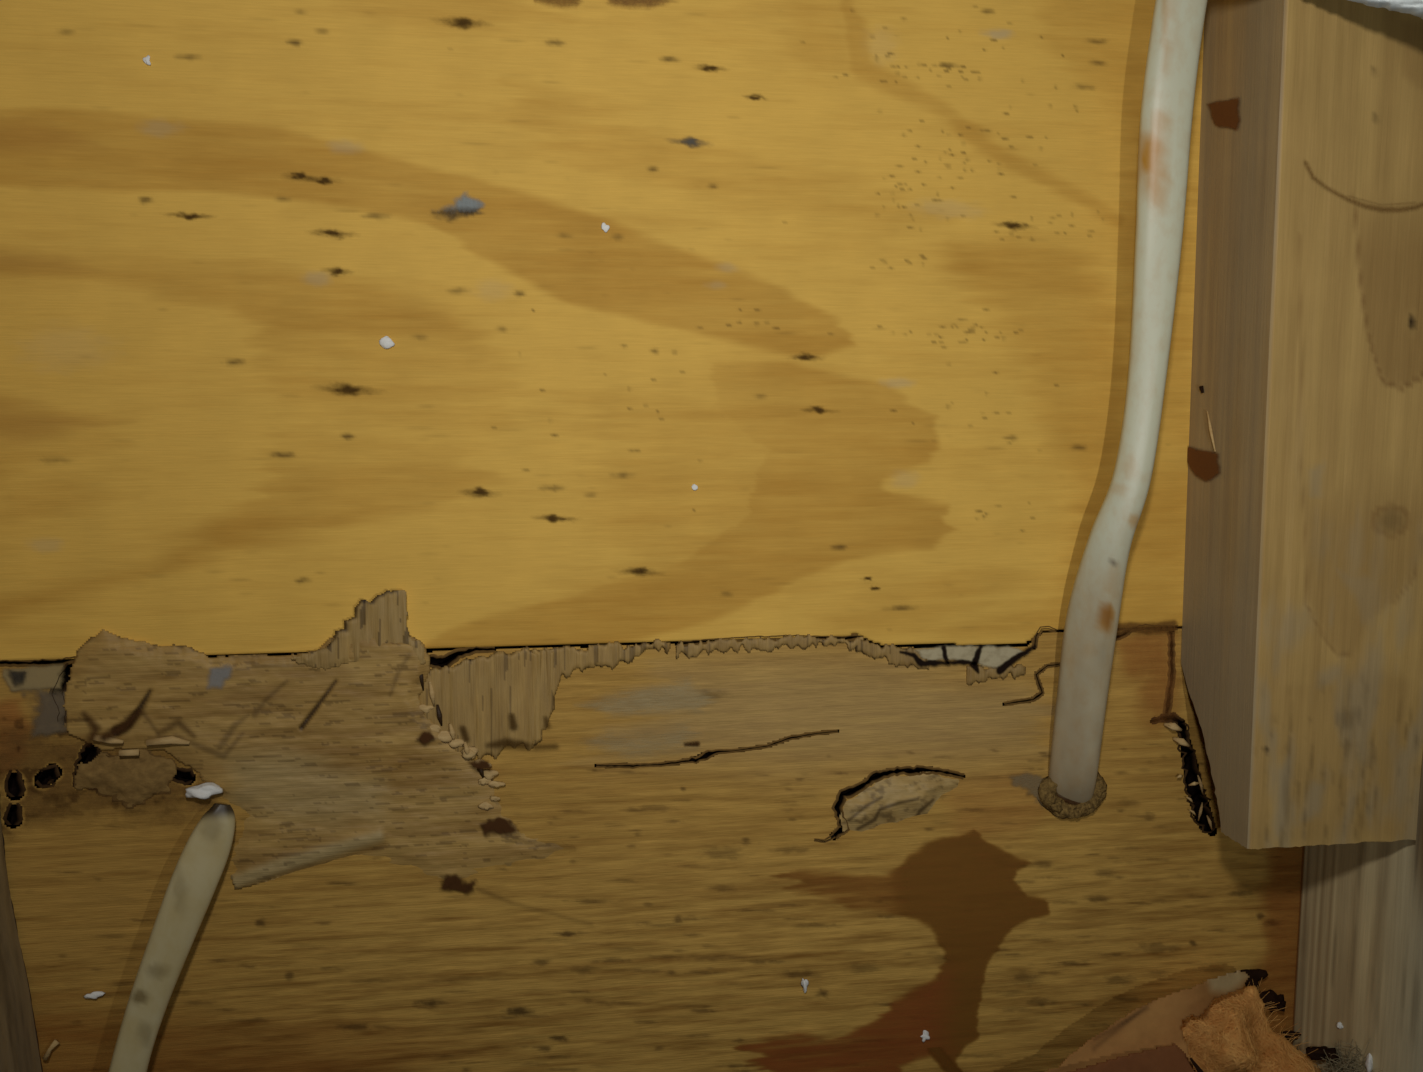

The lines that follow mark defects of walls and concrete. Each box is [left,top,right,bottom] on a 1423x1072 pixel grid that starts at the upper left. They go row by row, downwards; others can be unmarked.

water stain [292,173,331,184]
water stain [443,196,482,218]
water stain [335,385,360,394]
crack [0,656,76,722]
crack [430,646,495,669]
crack [676,633,858,646]
crack [1004,626,1060,706]
crack [1116,624,1184,725]
spalling [419,639,671,810]
crack [595,729,838,769]
water stain [739,833,1048,1072]